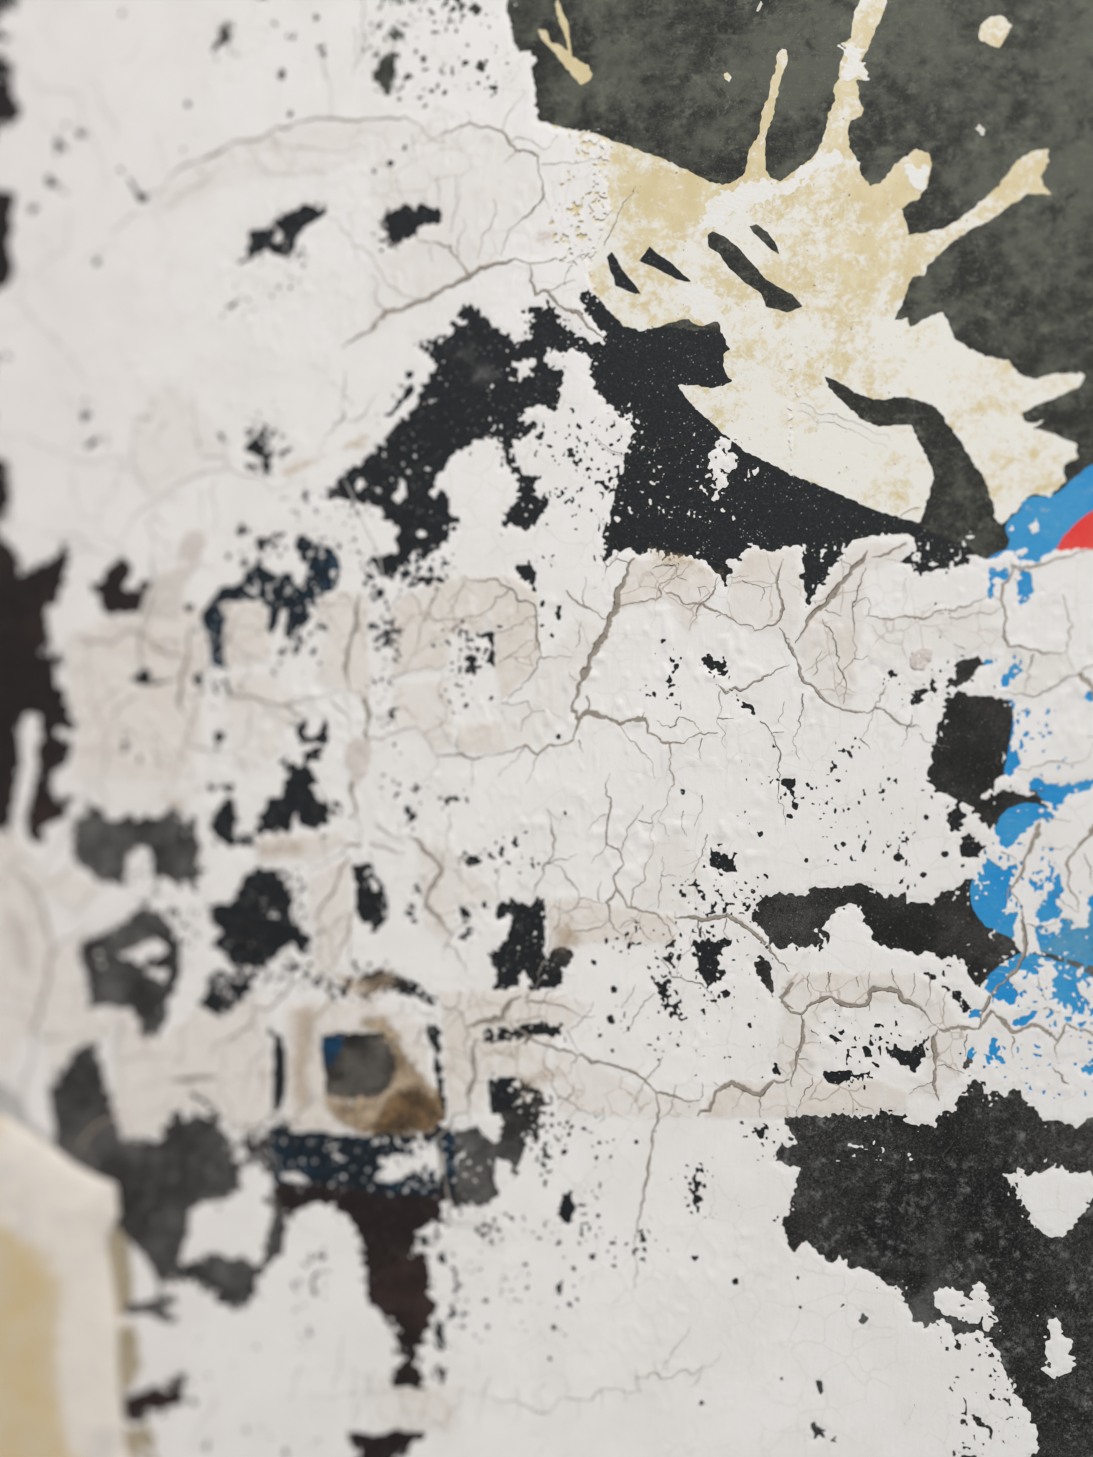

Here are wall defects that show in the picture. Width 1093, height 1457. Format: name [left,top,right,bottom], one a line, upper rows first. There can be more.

crack [145,0,636,452]
peeling [89,0,1093,833]
flaking render [0,460,669,1457]
crack [73,519,1093,1288]
peeling [652,1157,717,1218]
peeling [598,636,1093,1061]
peeling [820,1006,929,1090]
peeling [740,1053,1093,1457]